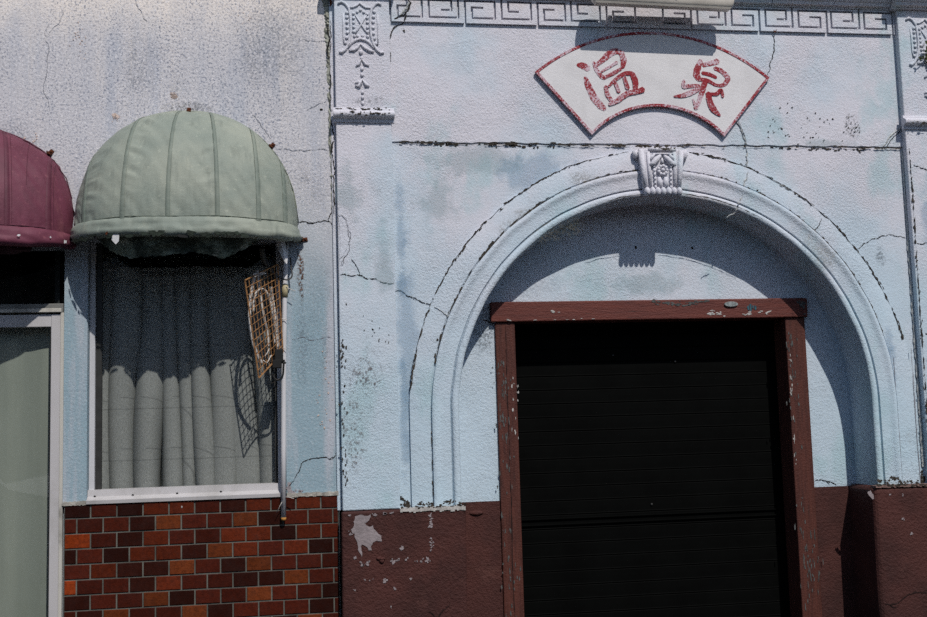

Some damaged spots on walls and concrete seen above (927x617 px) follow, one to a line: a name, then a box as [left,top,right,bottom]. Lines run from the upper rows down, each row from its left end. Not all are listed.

crack [682,121,762,219]
crack [300,213,449,317]
crack [858,126,927,482]
peeling [348,512,394,567]
peeling [390,431,434,564]